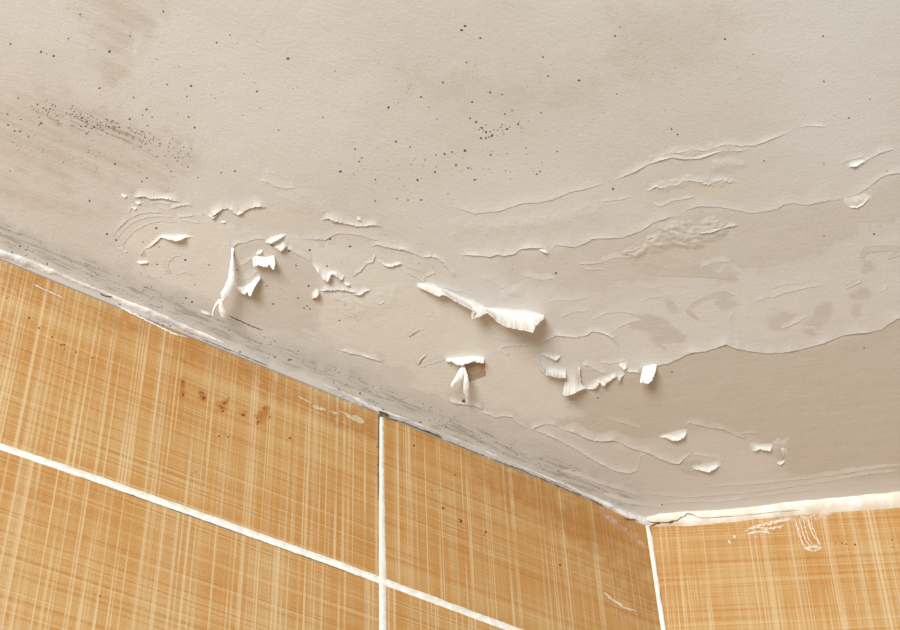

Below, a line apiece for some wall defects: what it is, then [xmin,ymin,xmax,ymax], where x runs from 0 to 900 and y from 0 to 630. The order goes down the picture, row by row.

water stain [118,303,188,338]
peeling [110,165,407,363]
peeling [417,280,900,396]
water stain [298,396,364,424]
peeling [416,353,790,476]